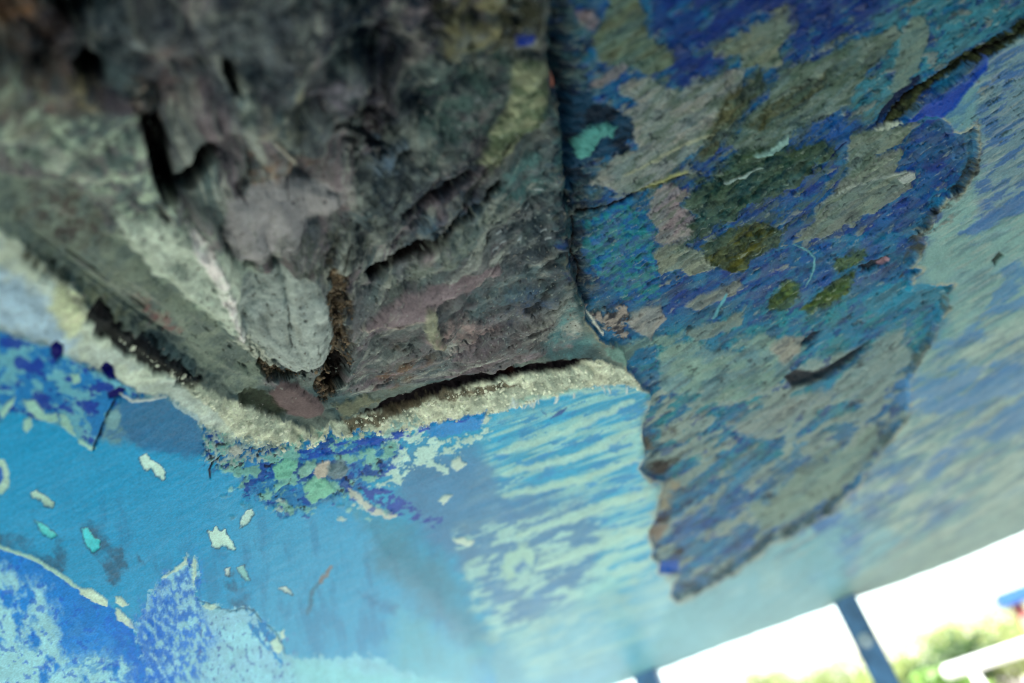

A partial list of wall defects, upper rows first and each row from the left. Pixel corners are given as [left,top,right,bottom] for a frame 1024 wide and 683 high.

crack [876,19,1024,131]
spalling [0,0,1024,520]
peeling [566,126,1024,603]
peeling [36,522,58,539]
peeling [82,528,101,553]
peeling [209,526,237,551]
peeling [241,510,254,527]
peeling [453,538,476,546]